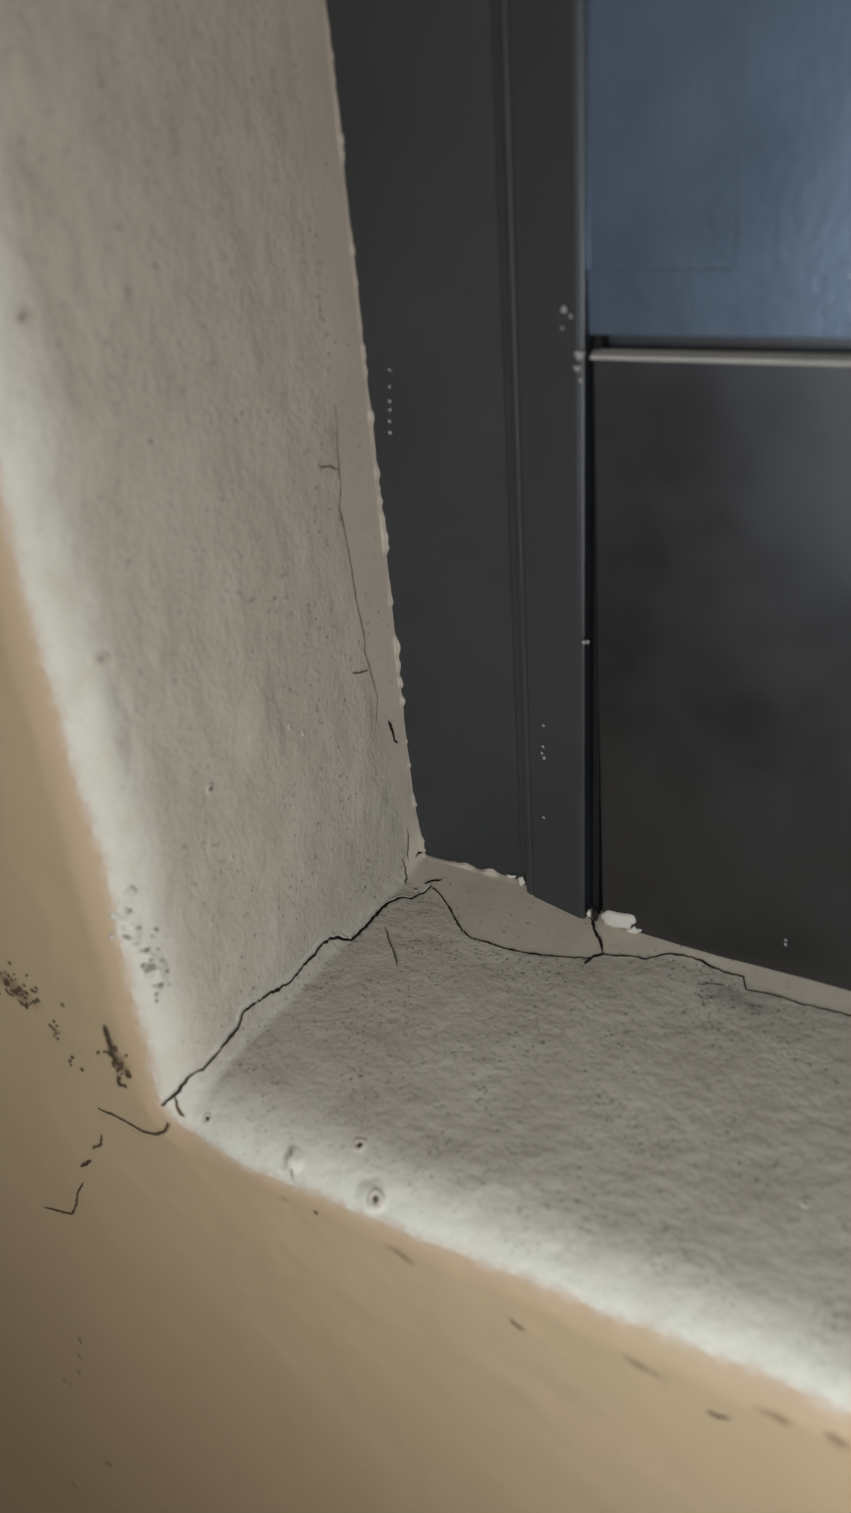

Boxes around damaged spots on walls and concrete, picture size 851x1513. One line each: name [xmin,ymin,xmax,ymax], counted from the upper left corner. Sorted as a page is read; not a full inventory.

crack [319,405,398,743]
crack [45,827,851,1215]